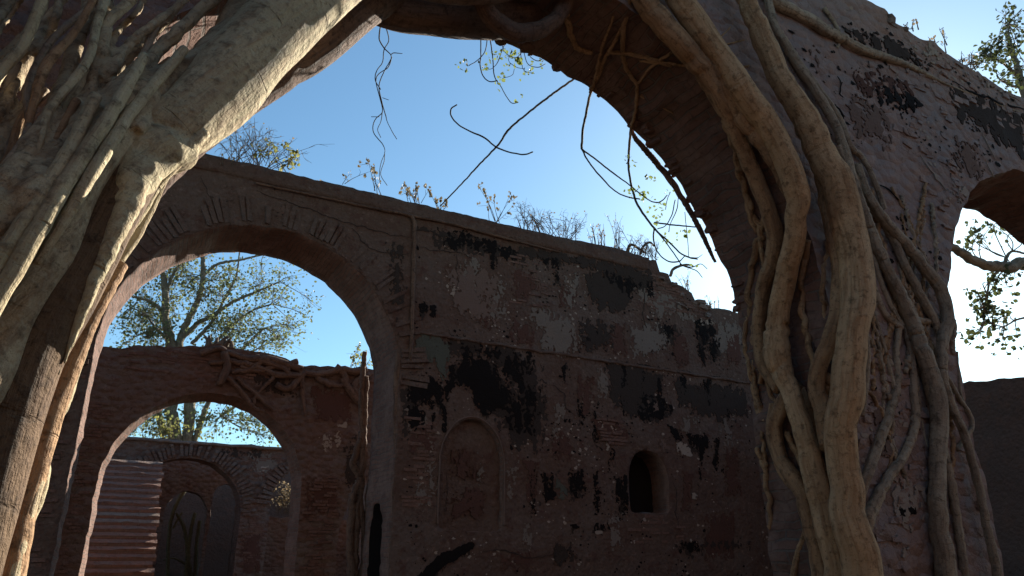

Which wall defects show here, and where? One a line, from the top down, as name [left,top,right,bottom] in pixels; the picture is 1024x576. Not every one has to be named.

flaking render [845,42,1024,231]
flaking render [604,270,713,325]